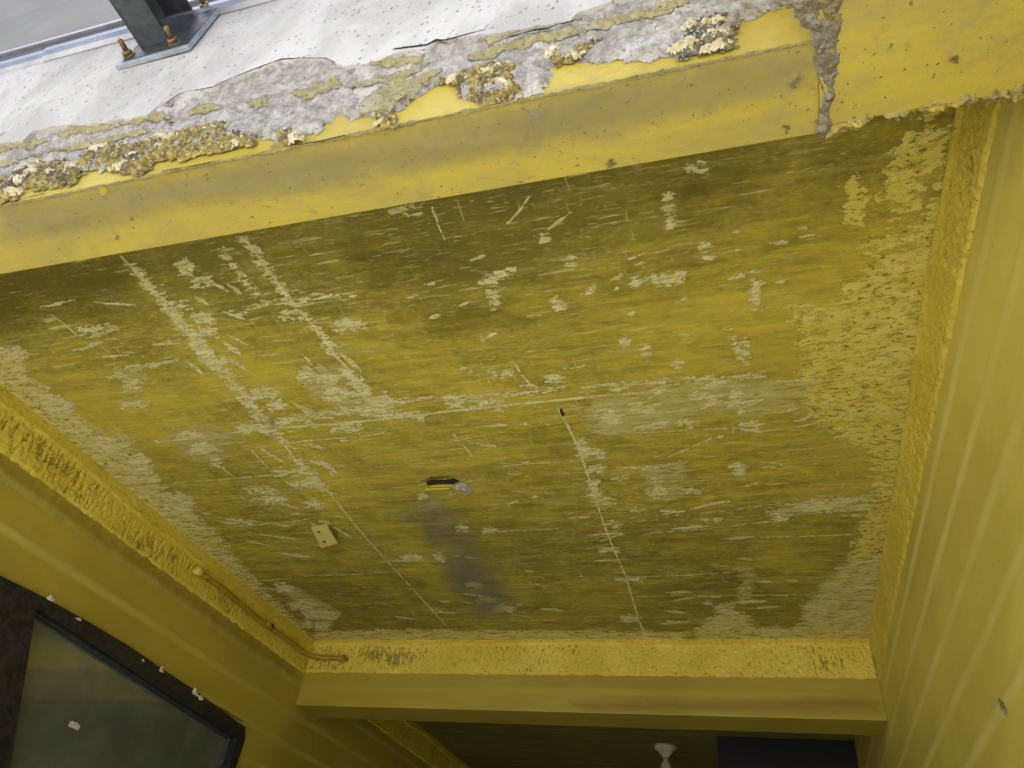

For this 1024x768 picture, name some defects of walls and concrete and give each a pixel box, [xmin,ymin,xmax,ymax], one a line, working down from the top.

flaking render [0,0,812,208]
peeling [0,83,1024,640]